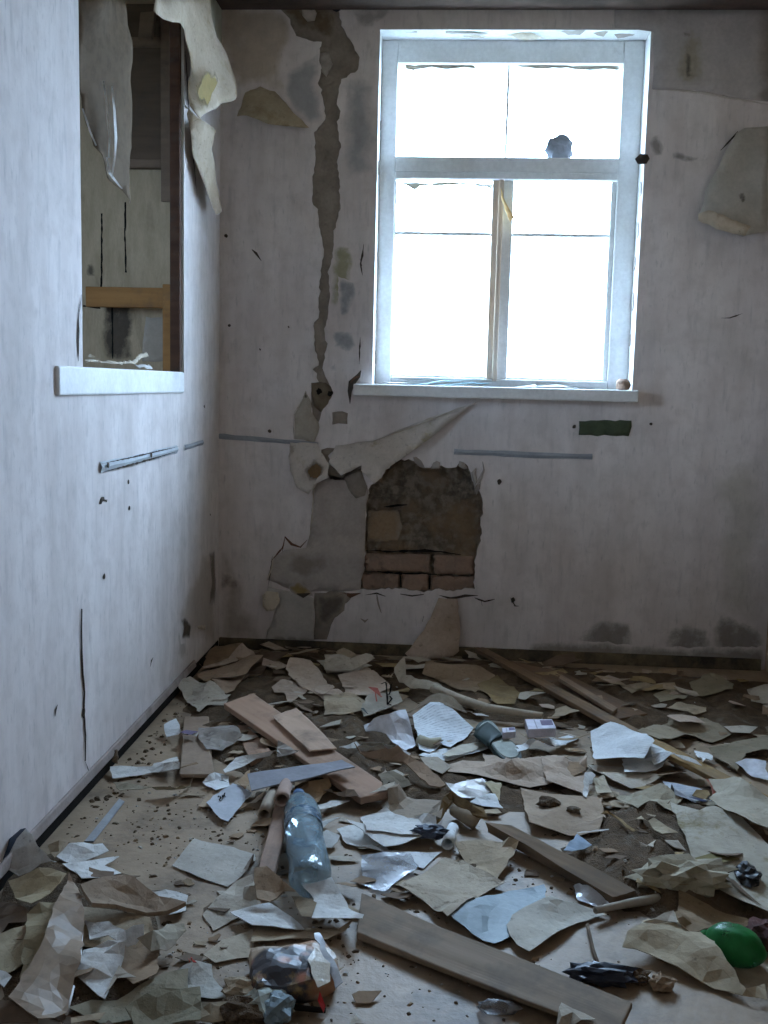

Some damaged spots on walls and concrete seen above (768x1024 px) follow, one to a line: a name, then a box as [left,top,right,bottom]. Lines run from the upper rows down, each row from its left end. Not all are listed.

flaking render [153,0,360,425]
flaking render [267,402,483,660]
crack [55,609,89,771]